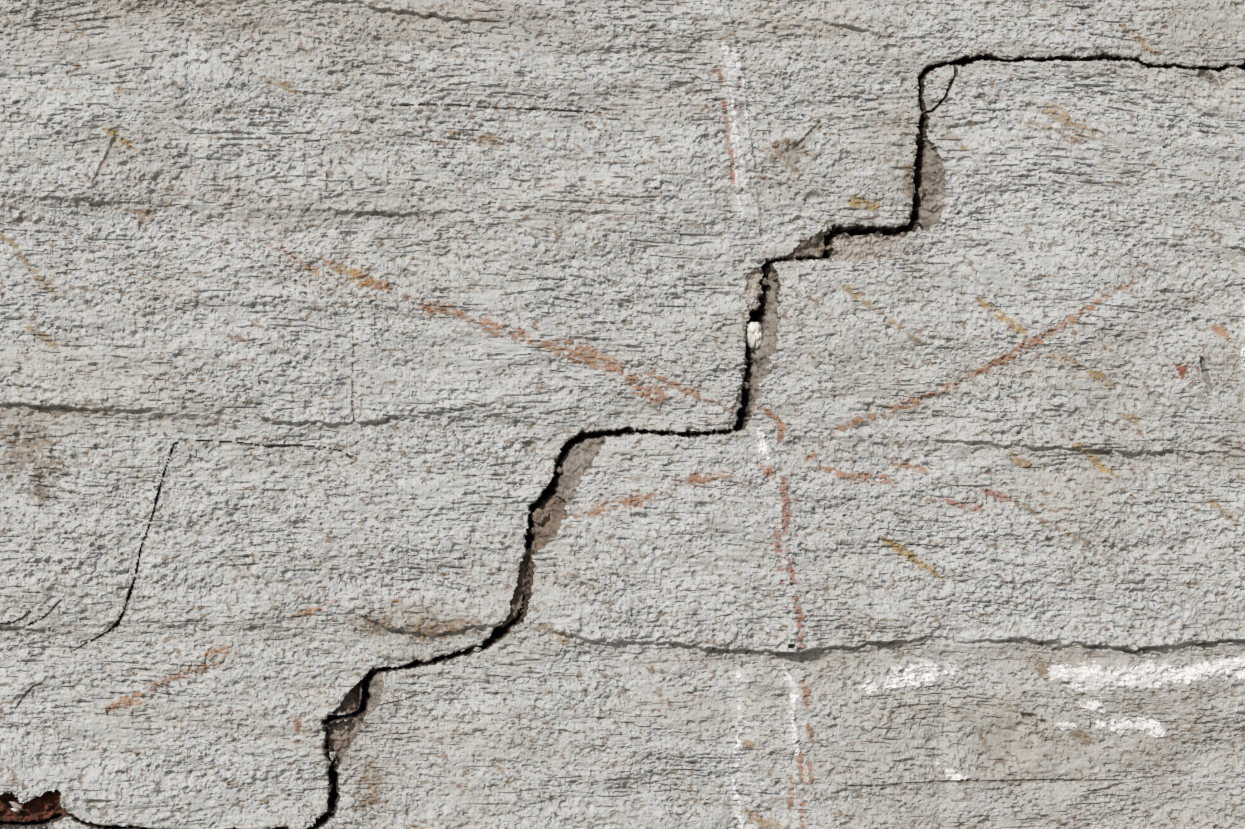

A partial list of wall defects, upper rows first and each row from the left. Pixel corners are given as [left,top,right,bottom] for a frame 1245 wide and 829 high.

crack [0,599,62,626]
crack [70,439,351,653]
crack [273,53,1240,829]
crack [66,812,151,829]